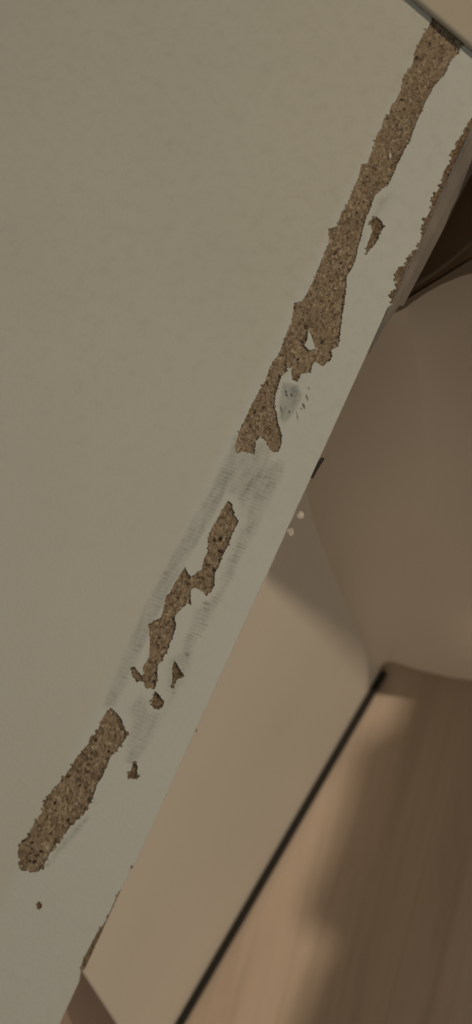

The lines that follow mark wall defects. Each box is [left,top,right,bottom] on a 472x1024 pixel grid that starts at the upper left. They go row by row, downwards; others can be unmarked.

peeling [235,17,472,454]
peeling [131,502,239,710]
peeling [18,708,129,873]
peeling [127,761,140,779]